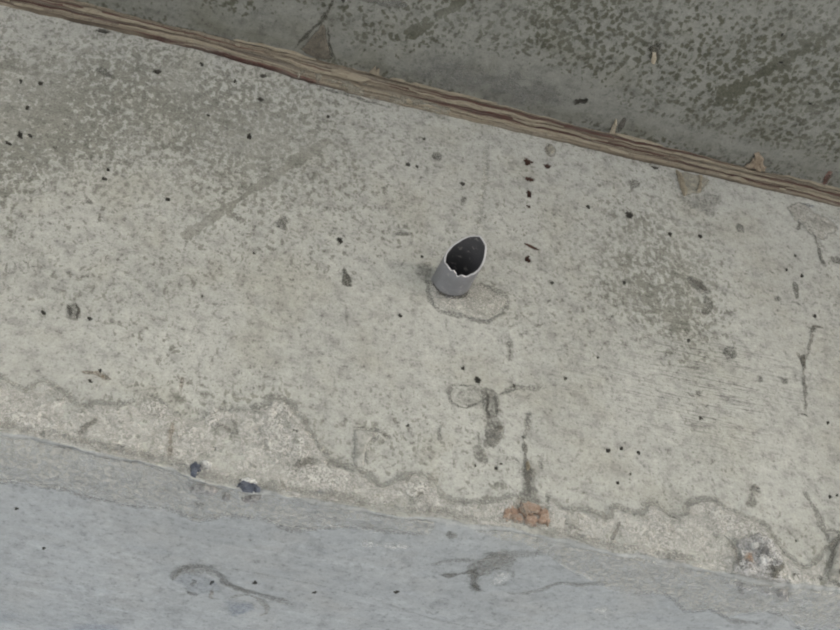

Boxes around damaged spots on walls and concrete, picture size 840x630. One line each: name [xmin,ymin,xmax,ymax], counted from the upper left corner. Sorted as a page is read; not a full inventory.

crack [797,325,822,415]
crack [515,413,543,503]
crack [804,492,840,574]